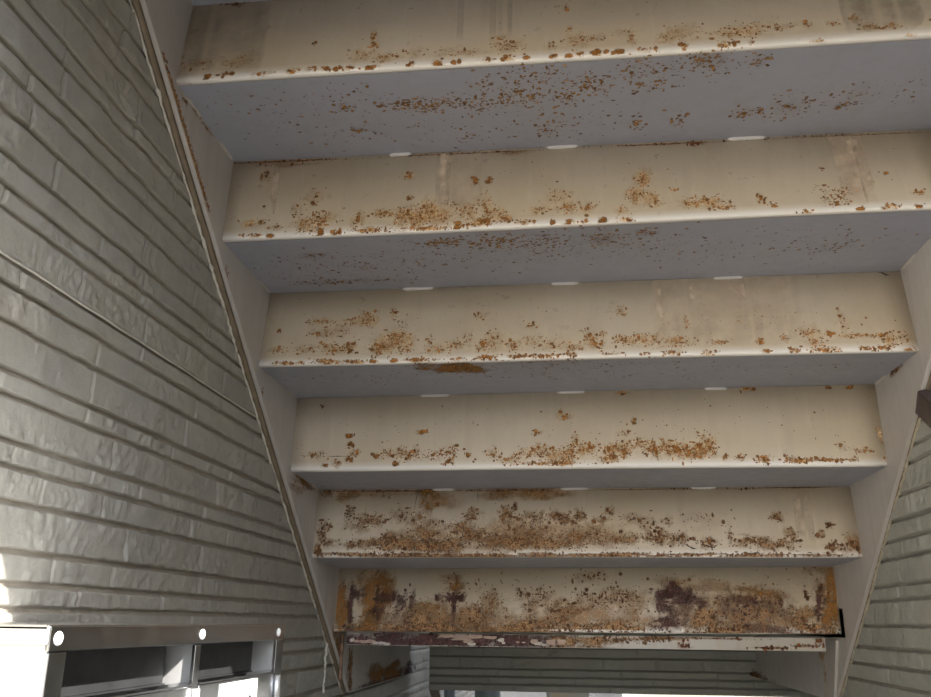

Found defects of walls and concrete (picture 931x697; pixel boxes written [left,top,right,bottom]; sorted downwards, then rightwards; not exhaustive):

corrosion [183,55,252,80]
corrosion [729,69,930,121]
corrosion [162,52,217,212]
corrosion [669,187,735,211]
corrosion [813,175,865,210]
corrosion [237,171,708,286]
corrosion [272,308,732,387]
corrosion [779,307,916,371]
corrosion [300,432,367,467]
corrosion [371,408,885,466]
peeling [411,634,505,647]